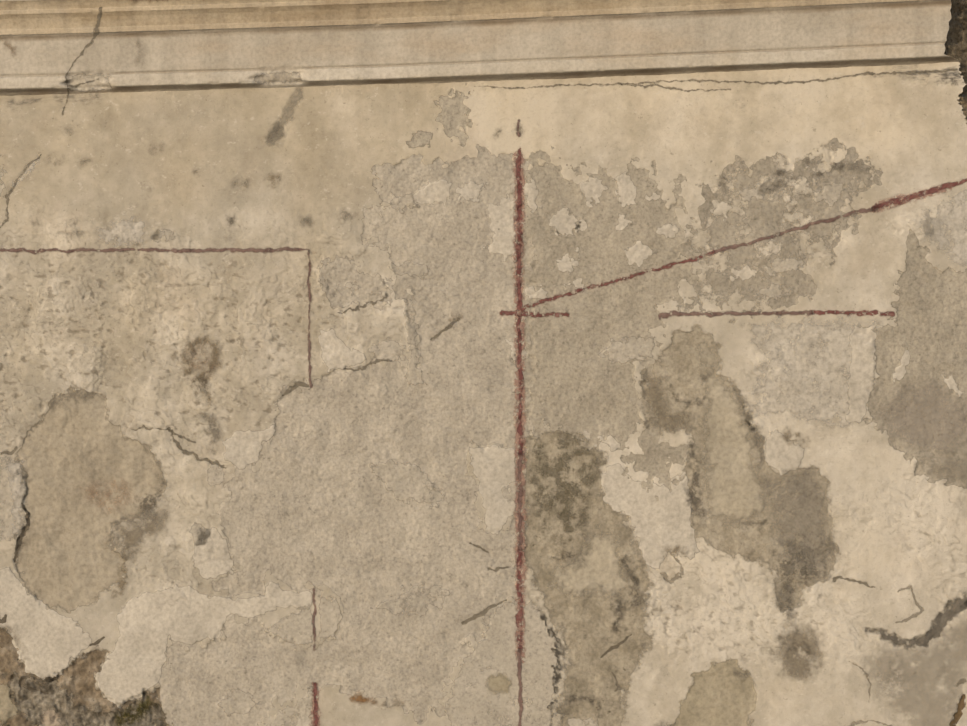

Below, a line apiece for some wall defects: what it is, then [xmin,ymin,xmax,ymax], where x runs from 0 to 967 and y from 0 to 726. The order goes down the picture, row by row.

crack [62,7,102,115]
peeling [434,83,473,147]
crack [0,155,41,228]
peeling [0,131,883,726]
crack [833,576,873,588]
crack [866,586,967,648]
damp [779,631,822,677]
crack [950,679,966,726]